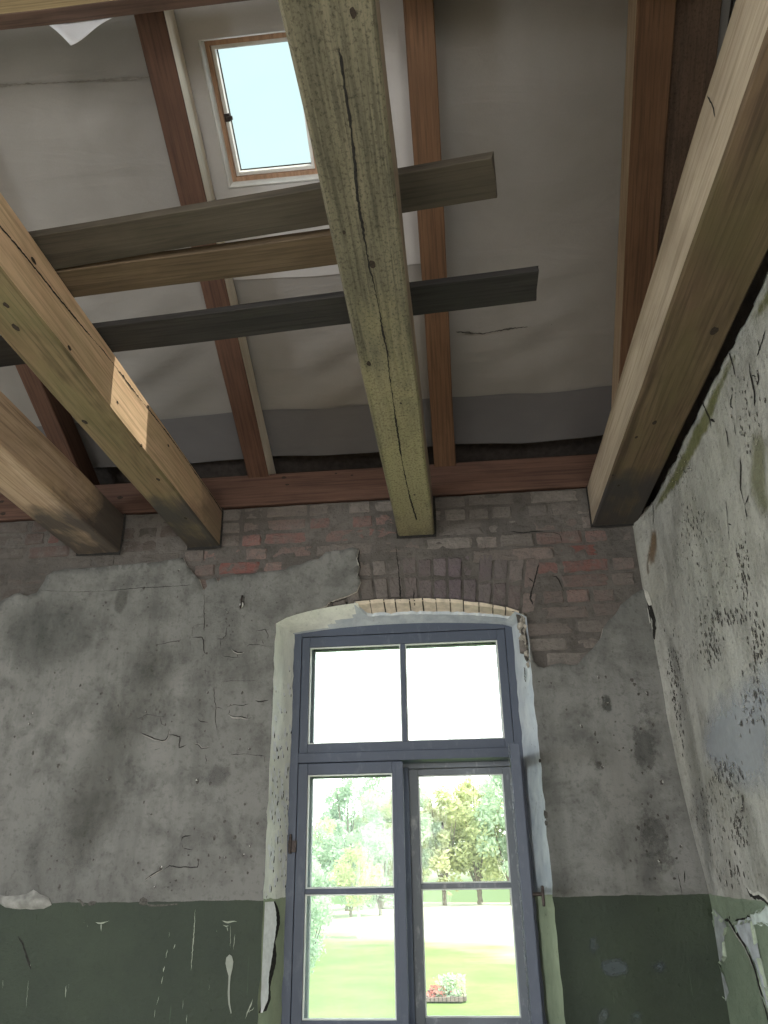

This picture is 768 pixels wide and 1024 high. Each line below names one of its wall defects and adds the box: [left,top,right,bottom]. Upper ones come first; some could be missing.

crack [339,49,417,520]
crack [47,585,268,761]
flaking render [354,453,768,889]
crack [145,835,199,880]
peeling [712,906,768,1013]